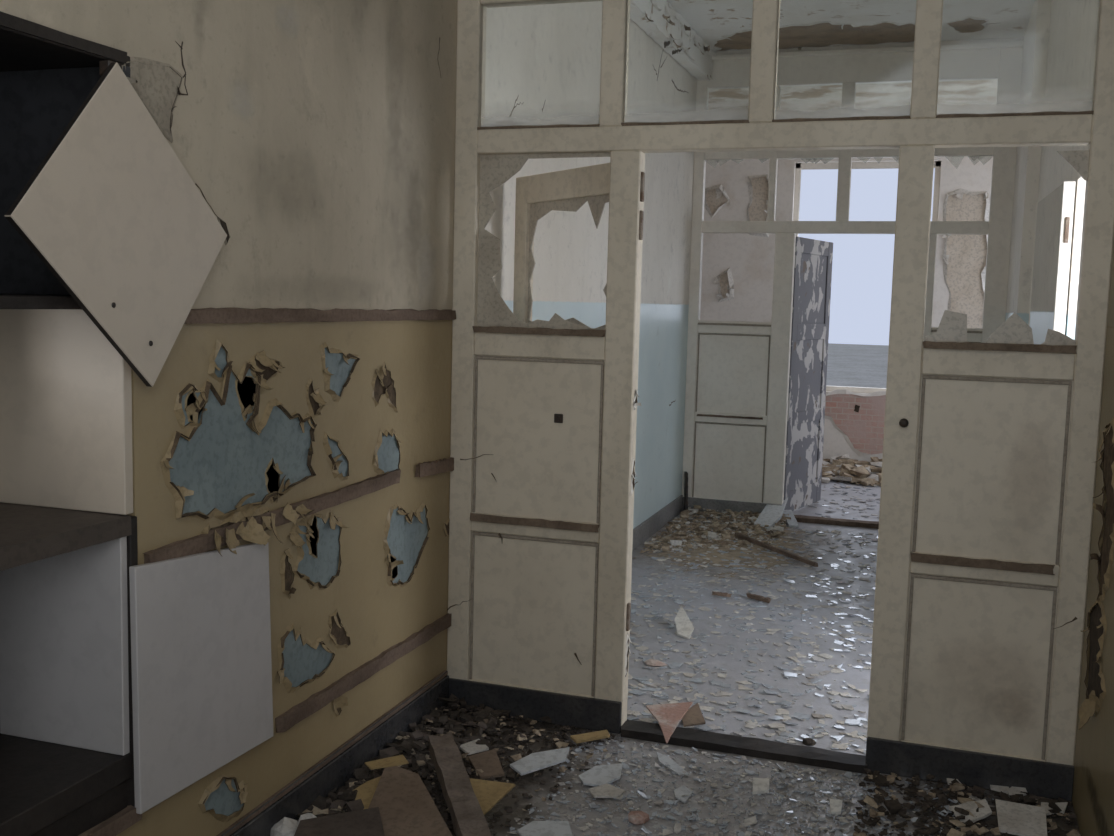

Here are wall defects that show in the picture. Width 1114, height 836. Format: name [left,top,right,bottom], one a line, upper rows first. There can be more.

peeling [645,0,752,55]
peeling [778,21,915,50]
peeling [944,16,989,33]
spalling [122,57,183,143]
crack [171,41,188,127]
peeling [704,184,731,218]
peeling [371,361,398,412]
spalling [825,389,886,460]
peeling [160,339,360,599]
peeling [383,502,450,587]
peeling [1078,417,1114,730]
peeling [277,609,351,693]